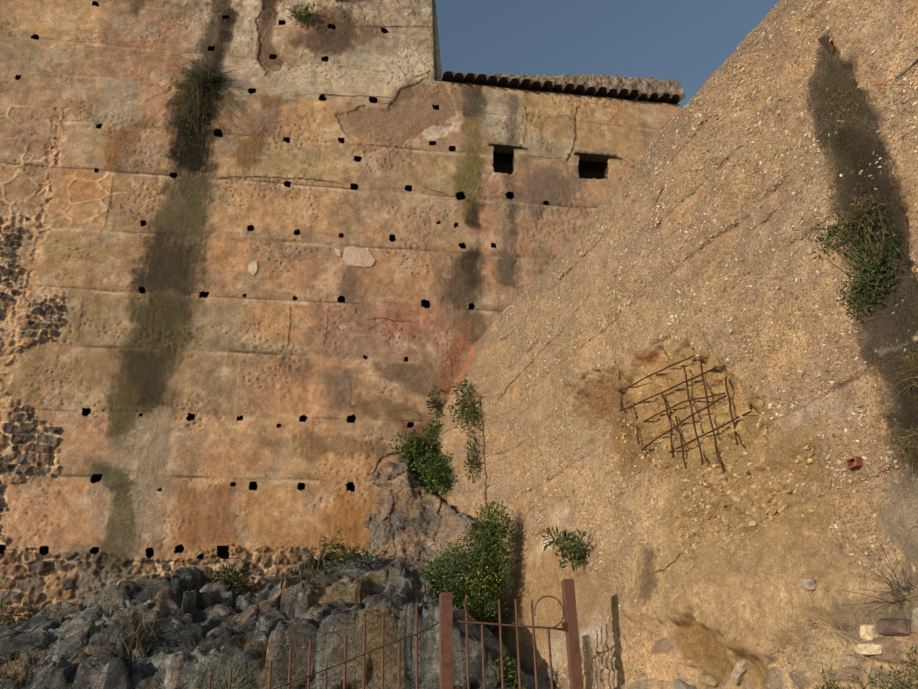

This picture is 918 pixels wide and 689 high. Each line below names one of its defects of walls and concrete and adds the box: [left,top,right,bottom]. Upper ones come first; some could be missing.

water stain [256,0,321,99]
water stain [462,84,487,116]
water stain [465,204,480,228]
water stain [497,166,585,285]
water stain [65,0,237,604]
water stain [440,247,485,341]
water stain [807,34,918,561]
spalling [575,346,823,571]